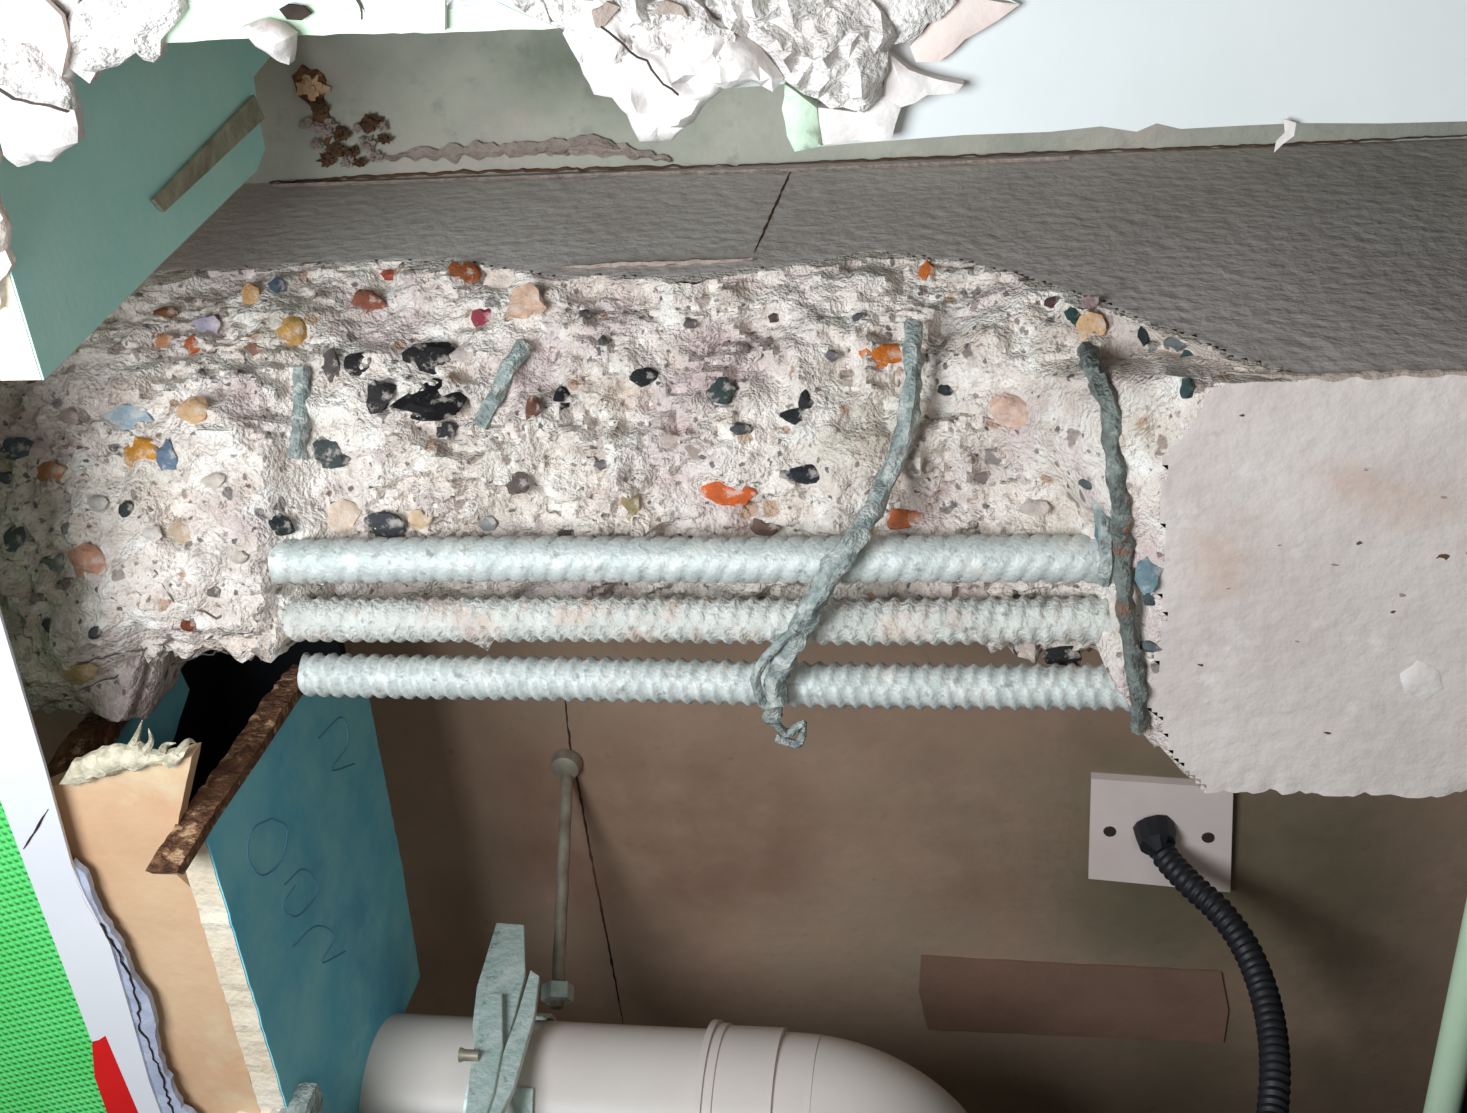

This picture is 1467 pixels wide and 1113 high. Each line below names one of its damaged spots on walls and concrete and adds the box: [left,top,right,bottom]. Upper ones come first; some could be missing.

peeling [0,0,1020,168]
peeling [1274,119,1296,152]
spalling [0,252,1467,793]